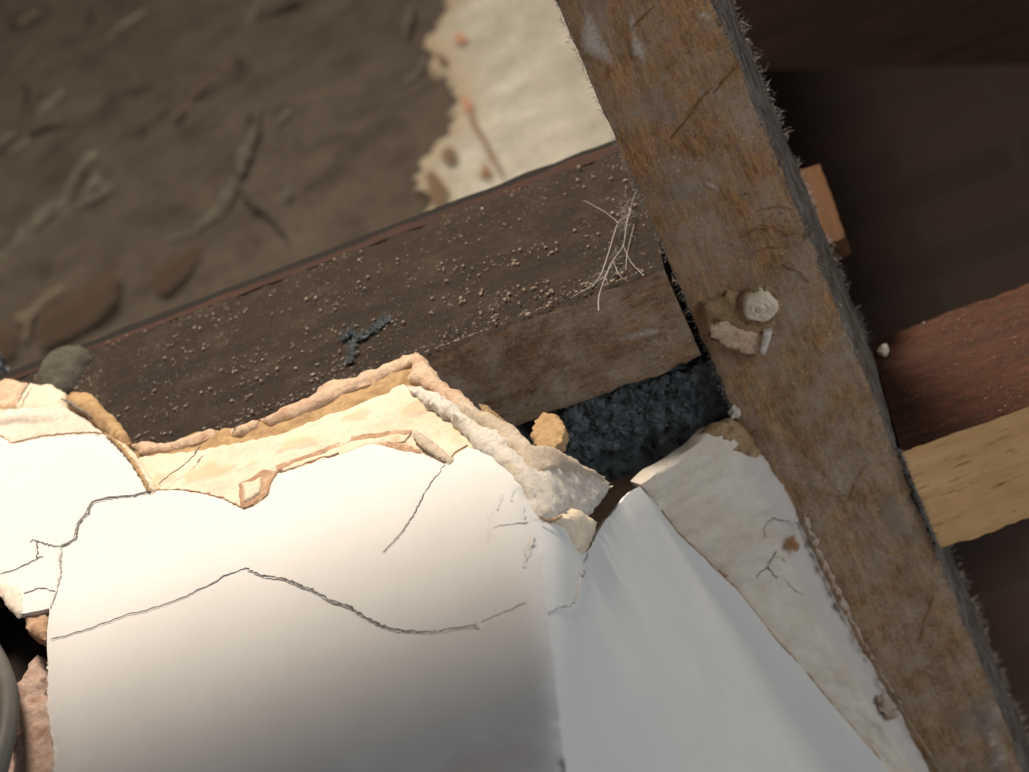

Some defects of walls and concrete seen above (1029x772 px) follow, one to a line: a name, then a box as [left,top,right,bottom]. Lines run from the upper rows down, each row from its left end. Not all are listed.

crack [0,447,200,608]
flaking render [0,352,612,555]
crack [51,553,588,639]
crack [383,465,445,553]
flaking render [630,417,941,772]